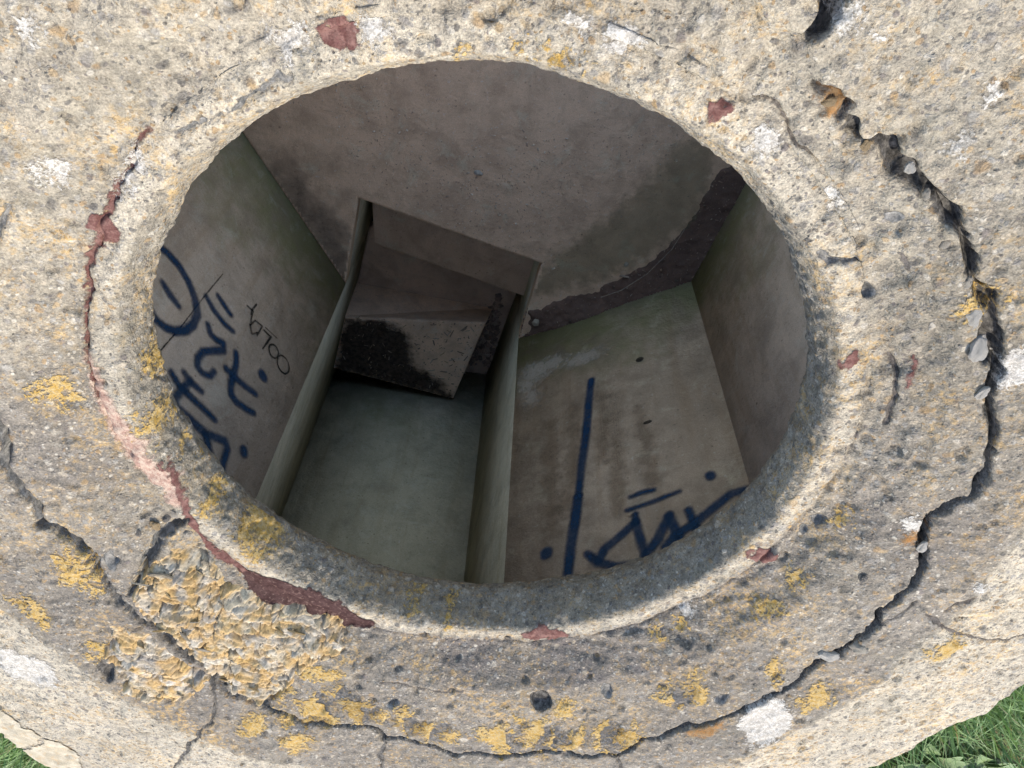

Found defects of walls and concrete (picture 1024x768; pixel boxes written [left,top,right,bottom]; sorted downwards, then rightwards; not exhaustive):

crack [161,274,223,351]
crack [740,80,1024,709]
crack [0,420,194,657]
spalling [102,543,347,706]
crack [173,673,276,768]
crack [352,724,391,768]
crack [616,719,716,768]